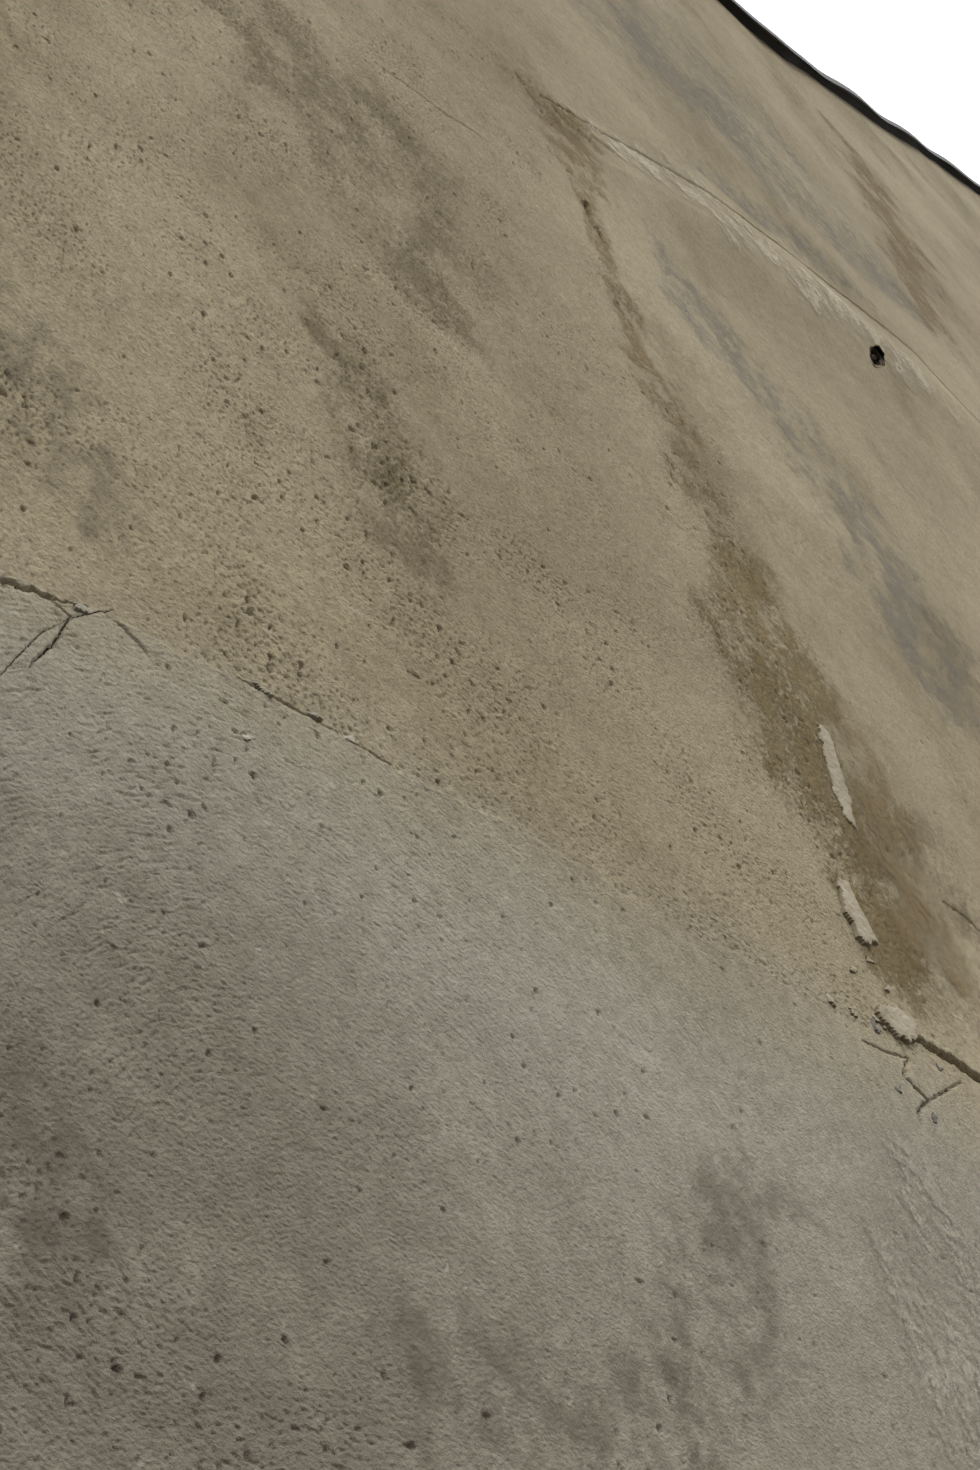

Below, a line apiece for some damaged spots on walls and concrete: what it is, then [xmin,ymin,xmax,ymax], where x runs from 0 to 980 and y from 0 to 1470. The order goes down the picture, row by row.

leakage [516,72,946,393]
spalling [869,347,885,367]
crack [1,601,113,675]
crack [252,680,274,699]
crack [240,734,256,742]
crack [305,712,356,744]
crack [871,1018,882,1034]
crack [894,1063,948,1124]